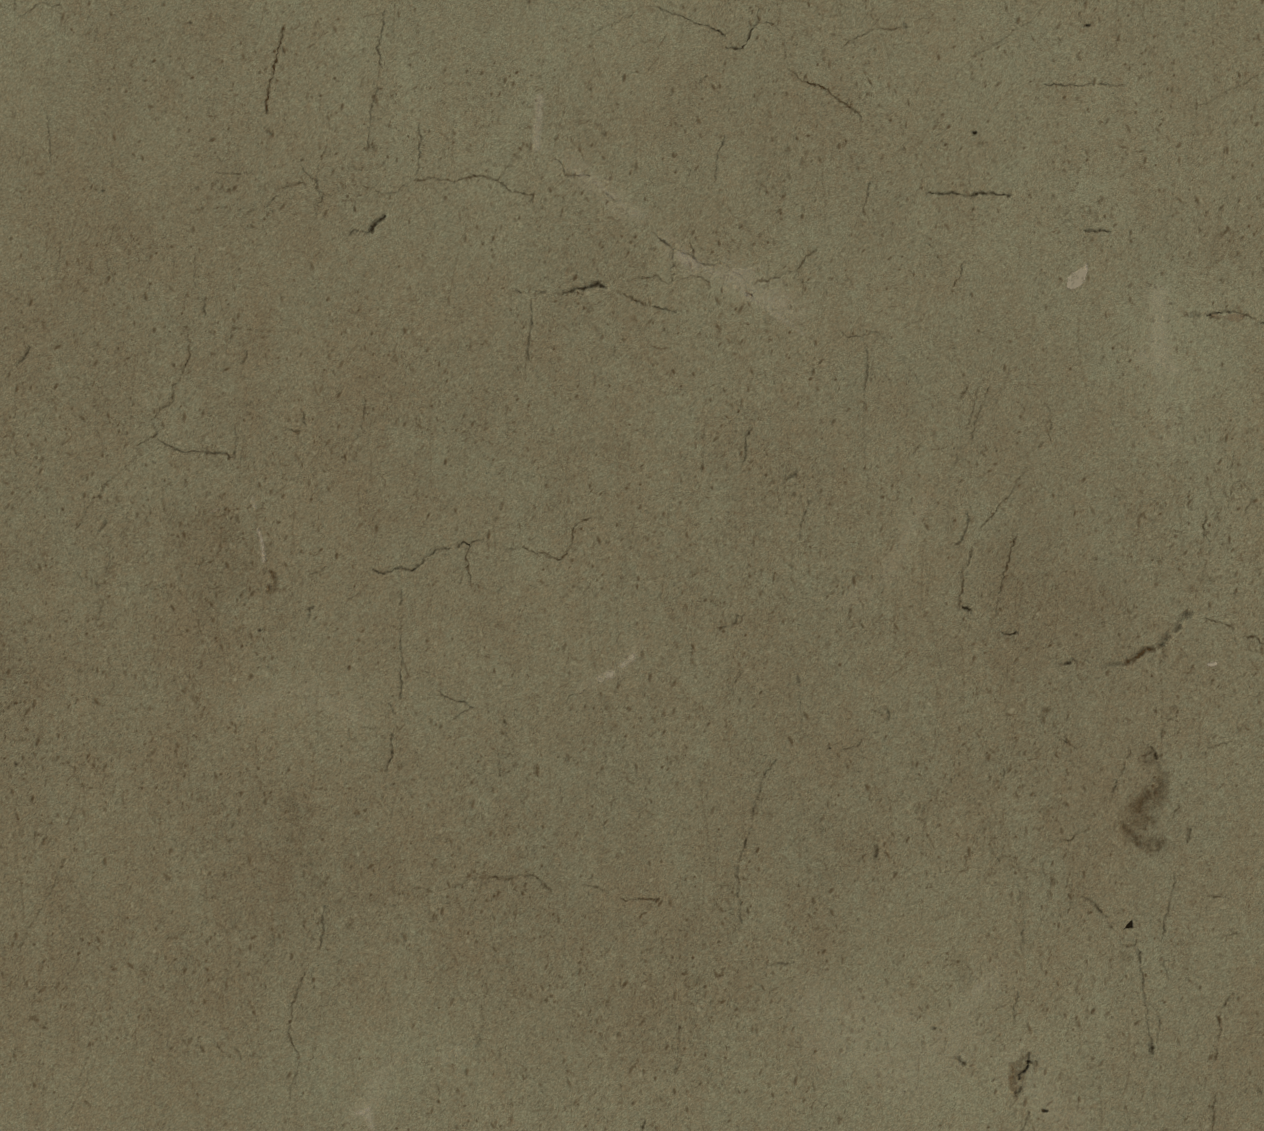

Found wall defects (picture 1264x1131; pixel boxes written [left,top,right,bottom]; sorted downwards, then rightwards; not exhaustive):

crack [265,27,284,112]
crack [931,190,1009,198]
crack [1126,643,1164,664]